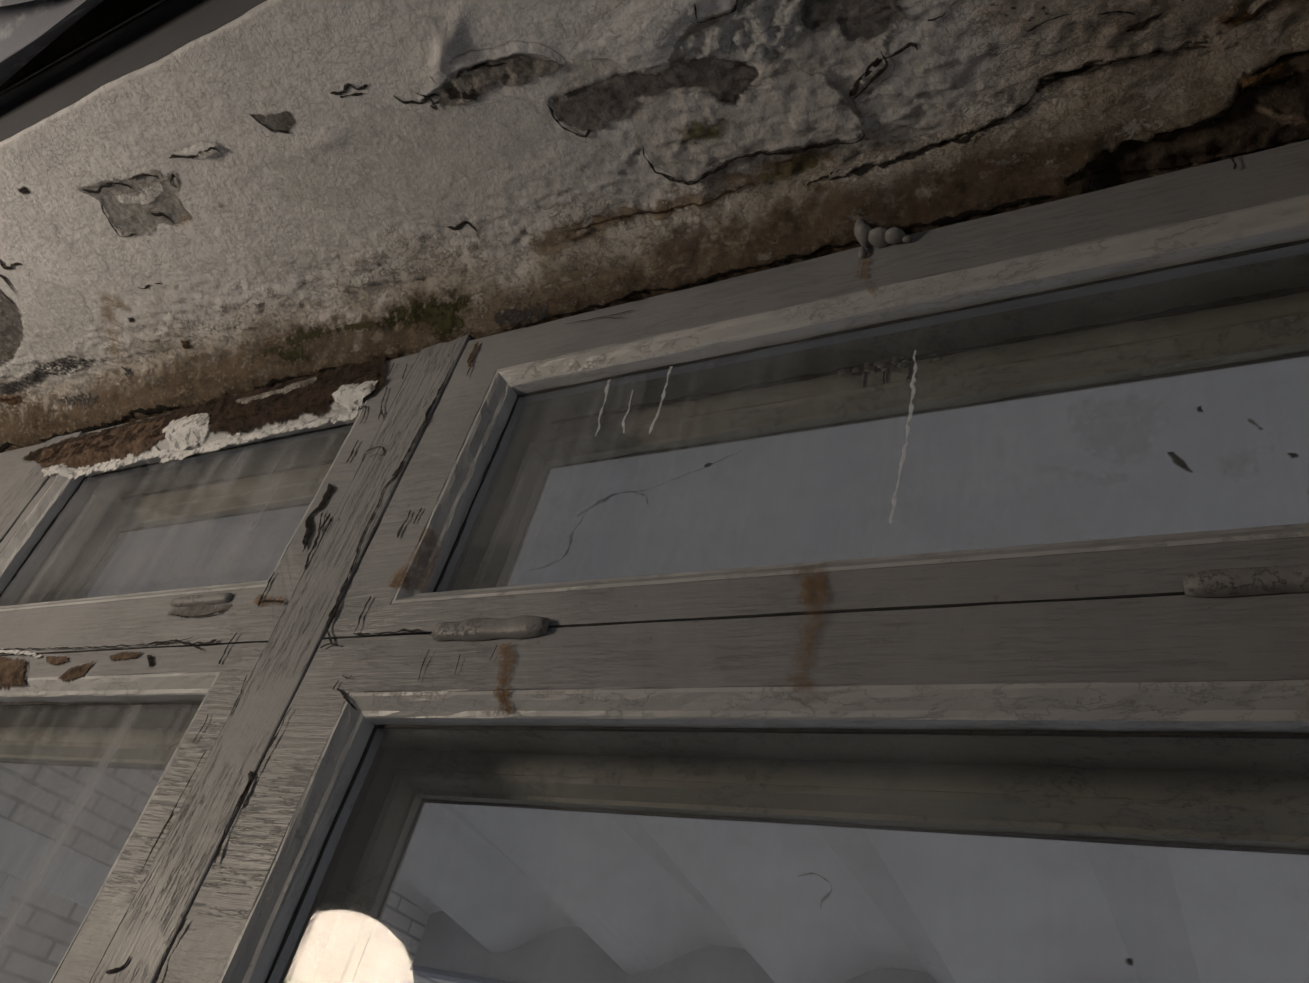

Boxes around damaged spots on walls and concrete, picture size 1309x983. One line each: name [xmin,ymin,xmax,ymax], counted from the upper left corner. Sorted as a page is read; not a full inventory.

peeling [416,0,918,185]
damp [850,0,956,149]
crack [806,0,1273,185]
peeling [77,170,192,238]
damp [269,97,632,225]
crack [446,220,478,232]
crack [897,195,1050,229]
damp [19,283,105,377]
mould [263,291,471,361]
peeling [23,355,386,479]
crack [302,241,860,710]
peeling [0,637,192,690]